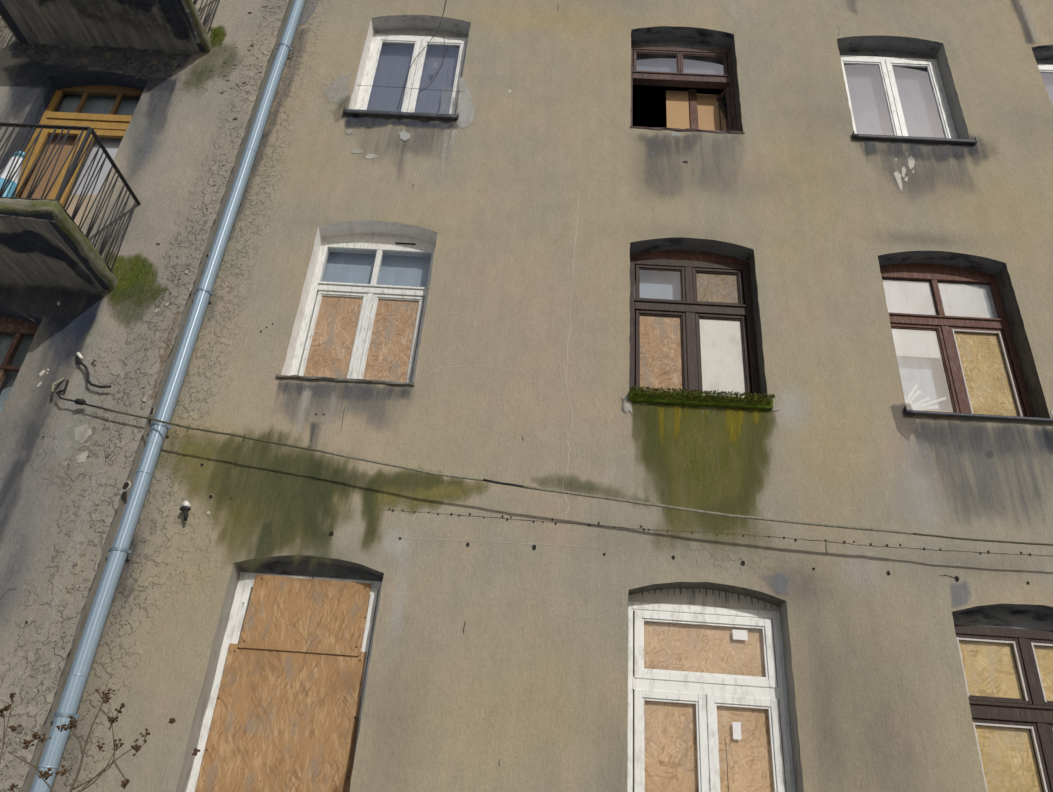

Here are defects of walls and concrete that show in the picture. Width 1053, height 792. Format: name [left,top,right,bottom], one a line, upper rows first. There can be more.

flaking render [893,152,915,193]
water stain [222,442,338,557]
water stain [892,403,1039,509]